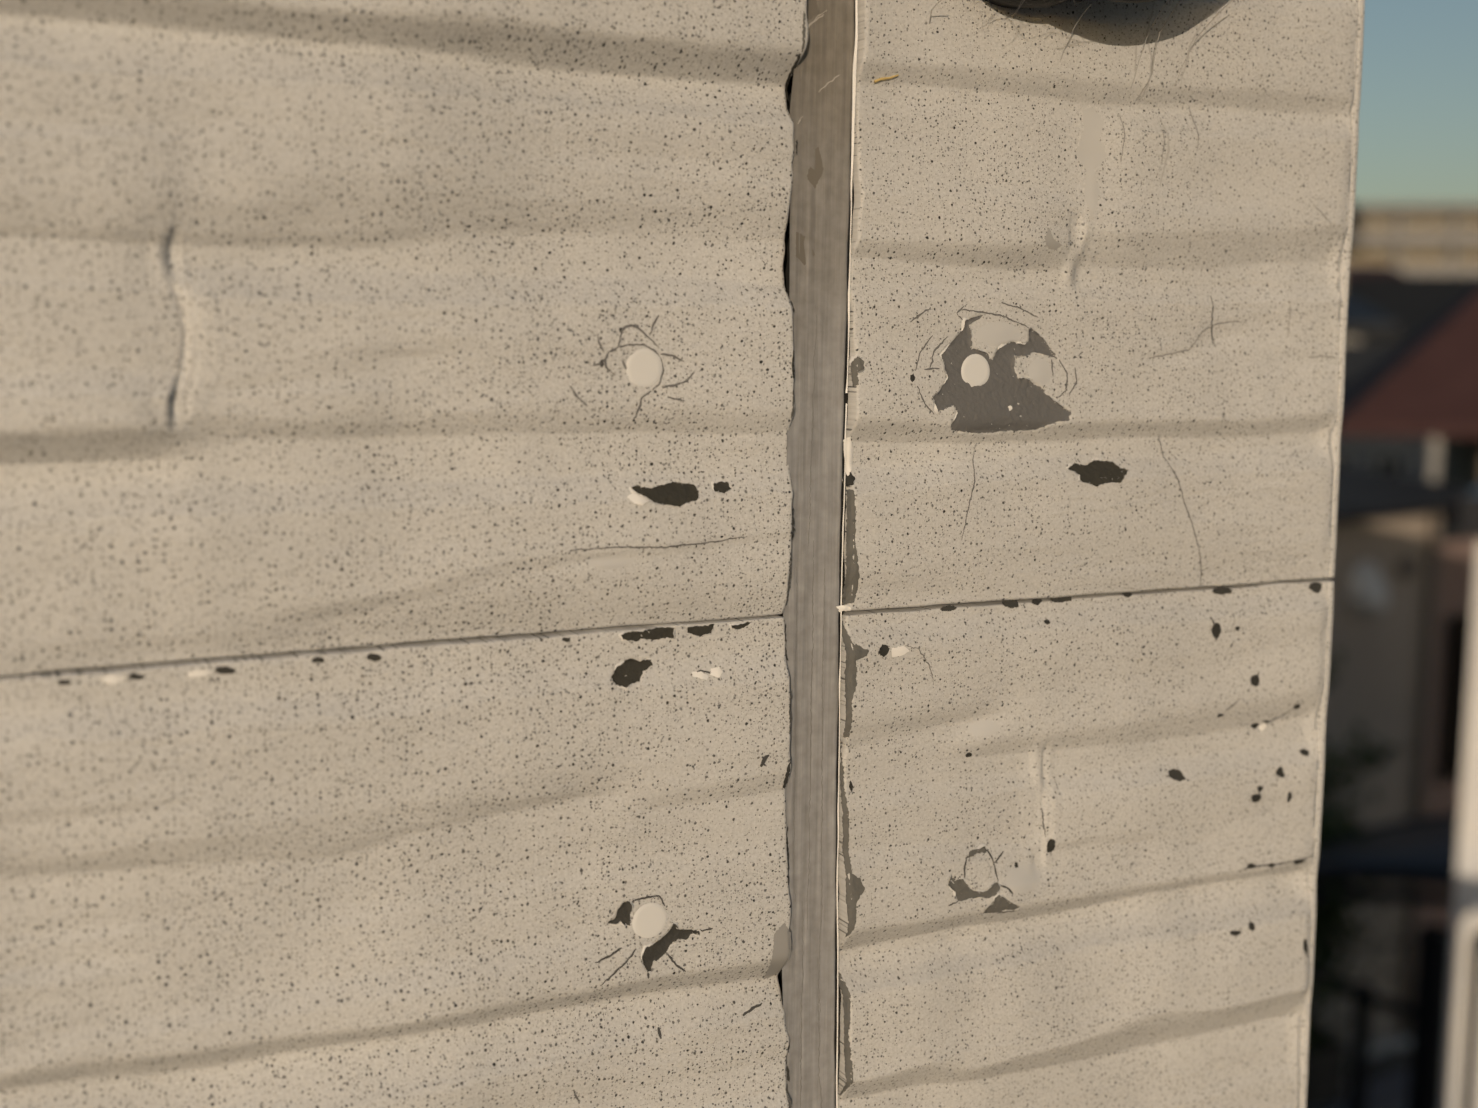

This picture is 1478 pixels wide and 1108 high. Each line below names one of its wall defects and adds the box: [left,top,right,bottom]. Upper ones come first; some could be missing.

crack [570,315,695,419]
peeling [933,315,1071,433]
peeling [1068,460,1128,487]
peeling [627,481,731,507]
peeling [1212,586,1232,595]
peeling [1211,623,1240,640]
peeling [611,621,751,688]
peeling [1168,769,1186,782]
peeling [1276,767,1292,802]
peeling [948,876,1019,913]
peeling [608,901,632,926]
peeling [642,923,700,972]